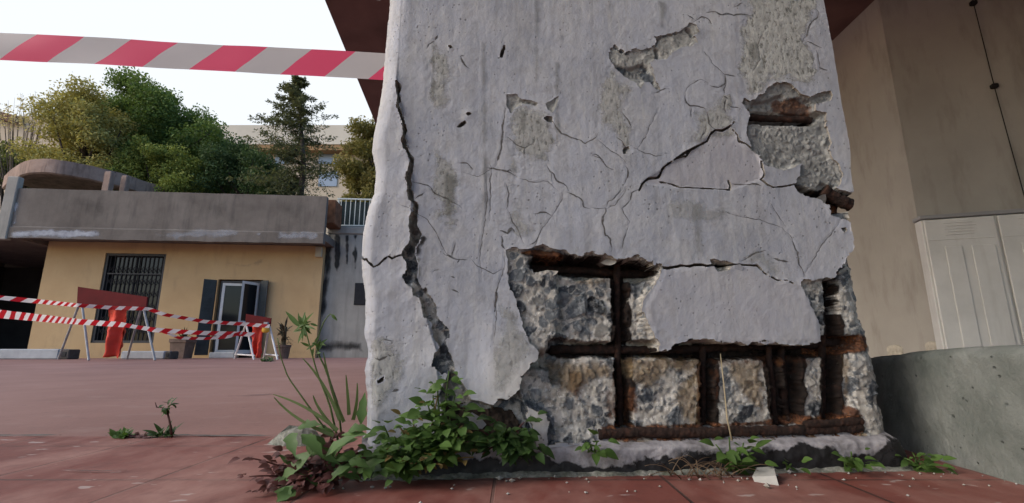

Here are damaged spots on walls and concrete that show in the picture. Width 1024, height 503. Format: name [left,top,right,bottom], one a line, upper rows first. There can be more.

crack [363,3,837,375]
spalling [609,23,699,90]
spalling [697,0,851,203]
corrosion [771,99,811,127]
corrosion [802,189,849,214]
spalling [439,244,884,444]
corrosion [522,249,868,442]